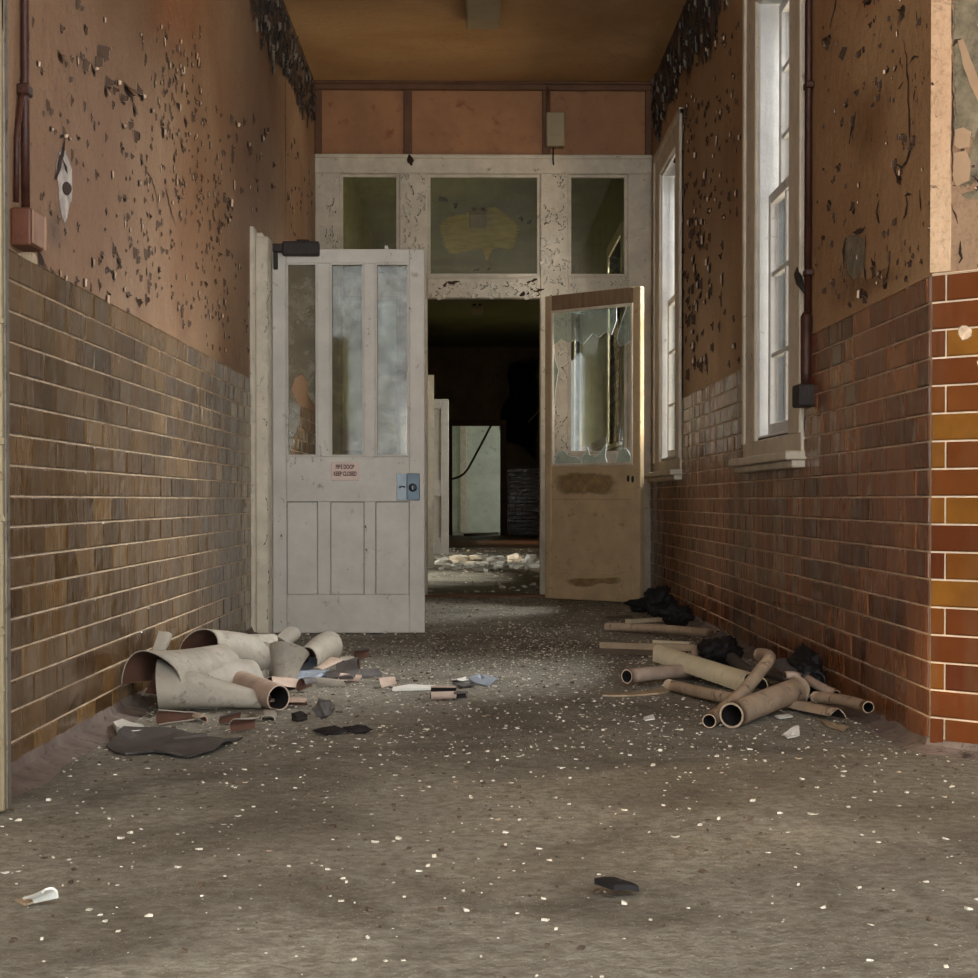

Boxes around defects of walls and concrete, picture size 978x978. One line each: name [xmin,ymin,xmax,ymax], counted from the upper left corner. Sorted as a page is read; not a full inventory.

peeling [821,26,865,62]
peeling [834,0,905,140]
flaking render [953,0,978,199]
peeling [16,22,270,353]
peeling [427,174,581,300]
peeling [651,0,754,381]
flaking render [818,217,930,309]